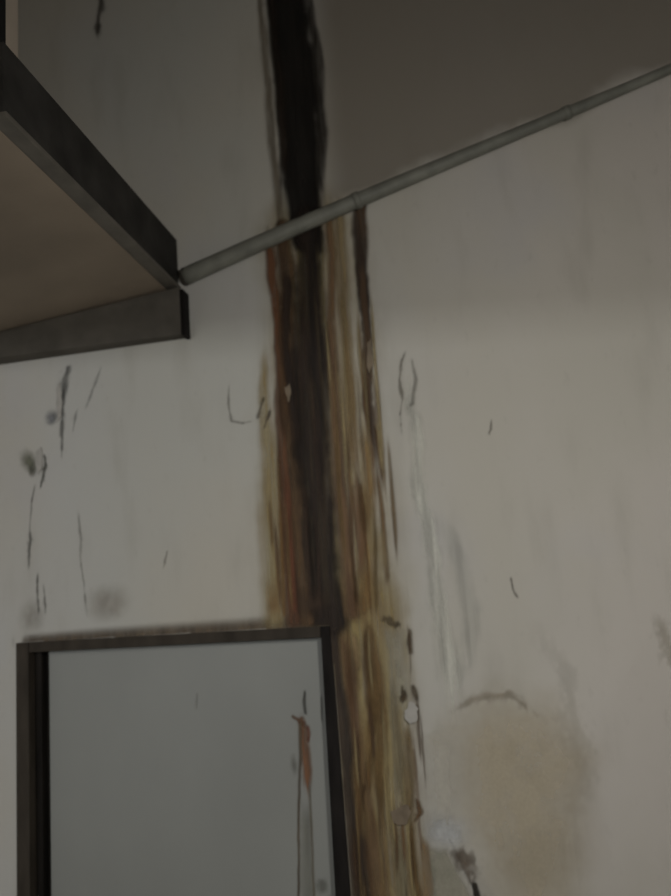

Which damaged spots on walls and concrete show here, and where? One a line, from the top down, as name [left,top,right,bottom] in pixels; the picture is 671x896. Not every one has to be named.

crack [95,0,104,34]
leakage [259,0,327,221]
crack [28,496,46,610]
rust [262,205,431,896]
leakage [404,363,452,692]
spalling [428,850,480,896]